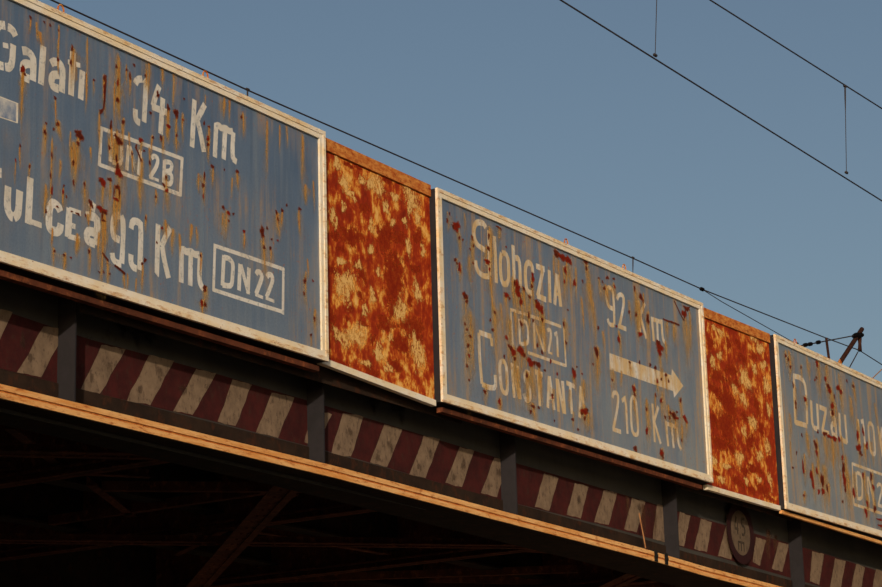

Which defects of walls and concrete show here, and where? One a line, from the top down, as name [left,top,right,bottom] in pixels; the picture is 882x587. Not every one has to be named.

rust [29,15,74,73]
rust [43,59,184,290]
rust [260,204,302,263]
rust [328,223,424,372]
rust [553,249,616,376]
rust [628,286,650,337]
rust [571,366,589,431]
rust [611,339,688,442]
rust [707,337,764,456]
rust [785,350,872,456]
rust [731,462,775,503]
rust [790,429,882,527]